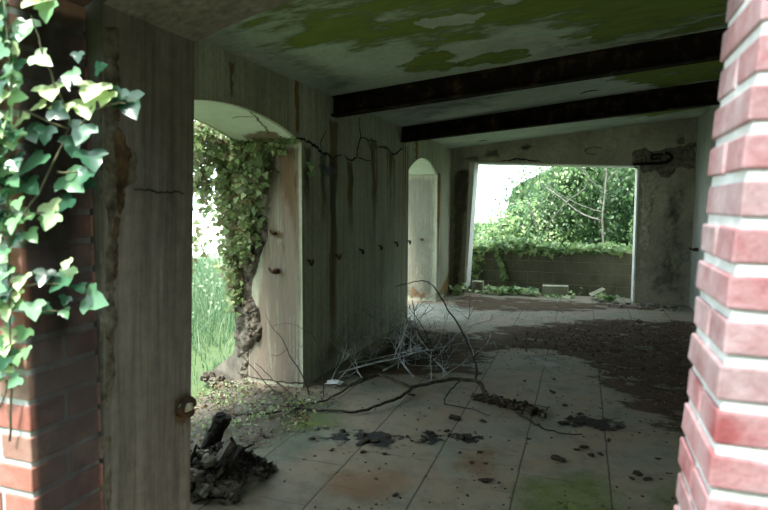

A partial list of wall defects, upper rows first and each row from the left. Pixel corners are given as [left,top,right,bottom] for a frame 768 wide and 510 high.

crack [232,111,405,167]
spalling [631,137,697,178]
spalling [99,27,137,410]
crack [134,187,184,195]
spalling [212,215,268,382]